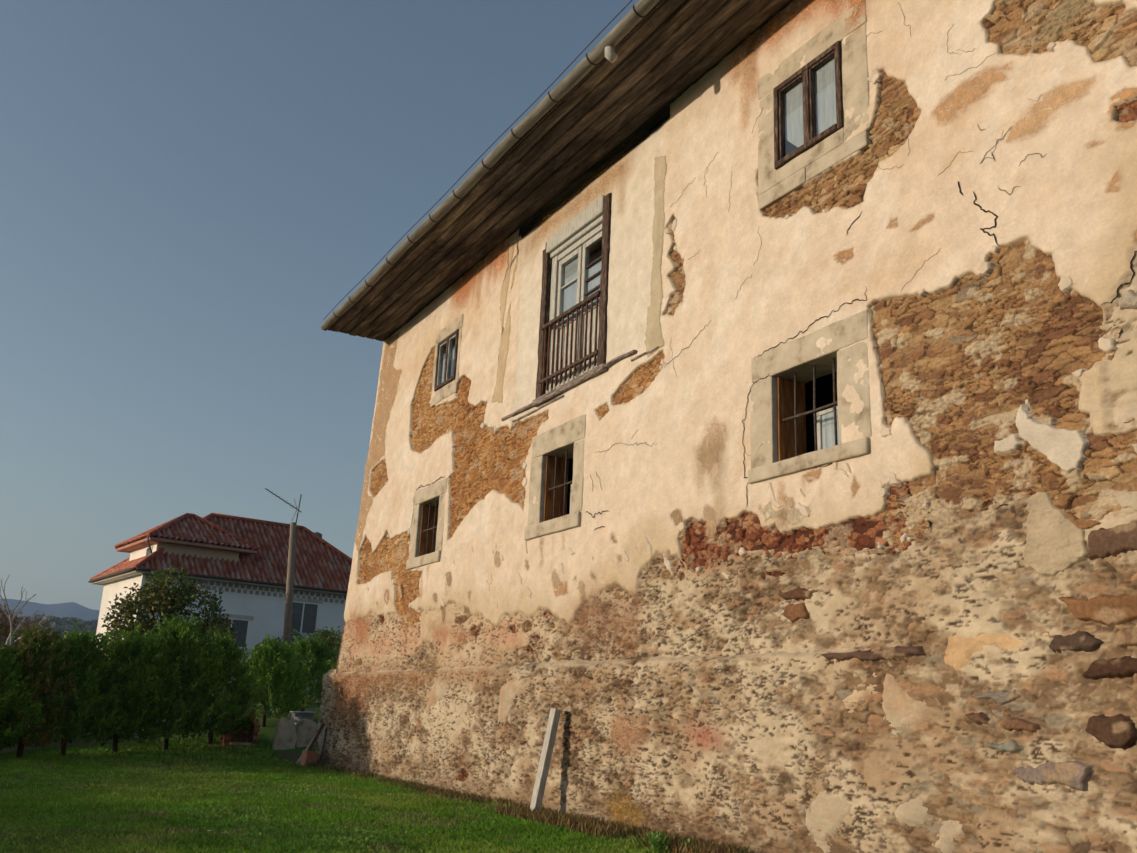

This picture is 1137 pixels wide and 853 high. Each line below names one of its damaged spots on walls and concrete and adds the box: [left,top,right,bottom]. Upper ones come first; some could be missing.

spalling [762,69,921,219]
crack [940,125,1046,247]
spalling [935,0,1137,121]
spalling [1109,88,1137,128]
spalling [664,218,686,315]
crack [1103,251,1137,304]
spalling [355,332,483,640]
spalling [409,348,549,538]
spalling [596,352,665,419]
crack [742,286,867,507]
spalling [611,238,1137,581]
flaking render [778,588,819,623]